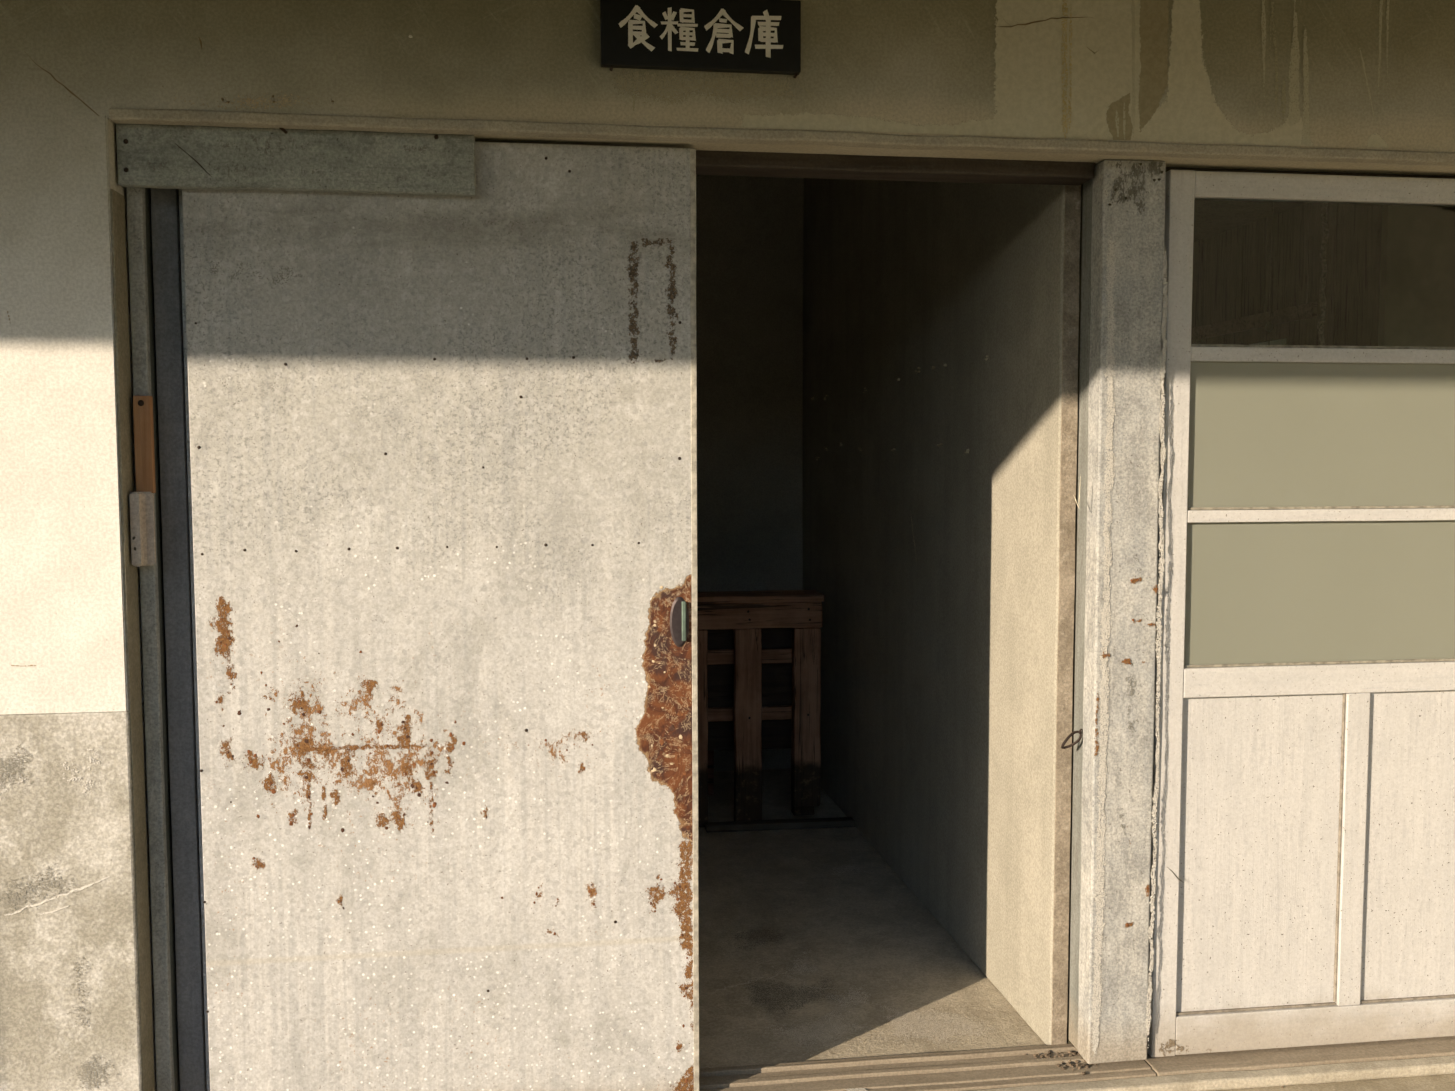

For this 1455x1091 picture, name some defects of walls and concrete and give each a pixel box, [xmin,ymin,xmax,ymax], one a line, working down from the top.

crack [1000,17,1096,54]
leakage [1106,0,1169,140]
efflorescence [1261,0,1311,145]
corrosion [209,596,465,833]
corrosion [635,575,693,1052]
corrosion [671,1066,694,1091]